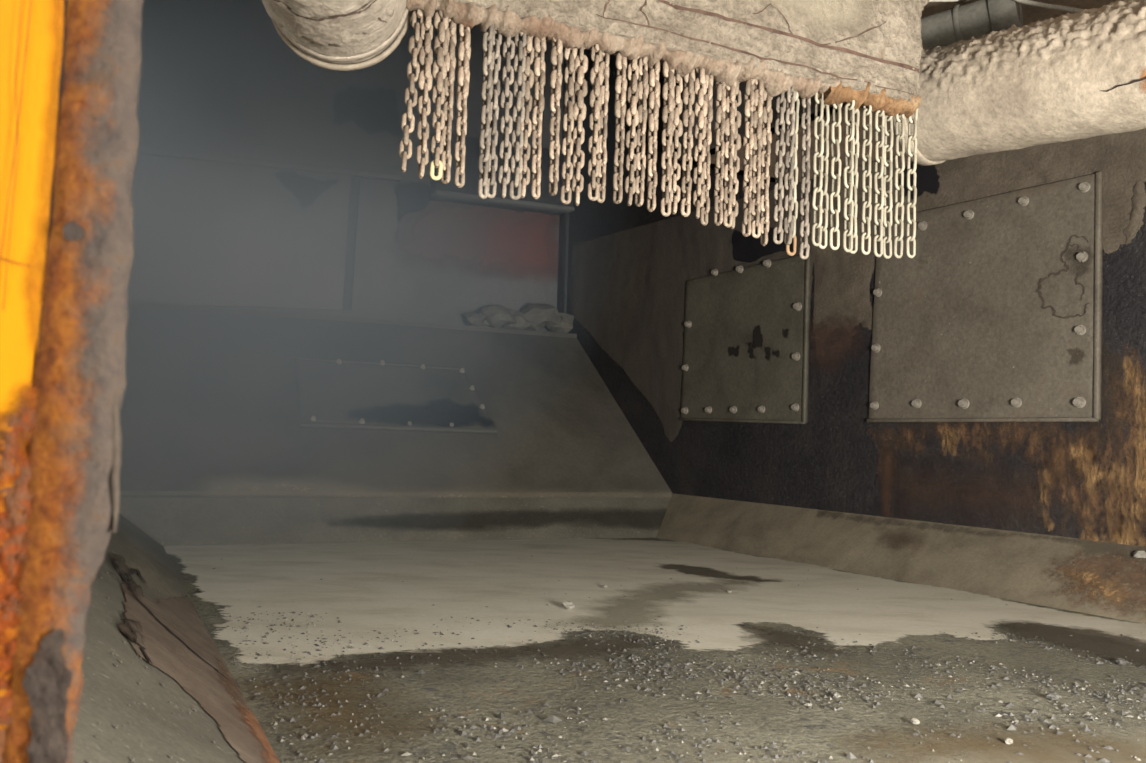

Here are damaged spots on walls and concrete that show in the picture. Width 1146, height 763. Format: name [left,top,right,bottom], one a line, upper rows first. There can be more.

crack [274,0,387,23]
crack [596,0,919,96]
crack [1104,76,1146,92]
rust [28,0,69,345]
rust [888,353,1146,546]
rust [0,385,39,763]
crack [100,555,236,685]
water stain [277,564,779,672]
water stain [750,628,839,653]
water stain [1002,622,1146,664]